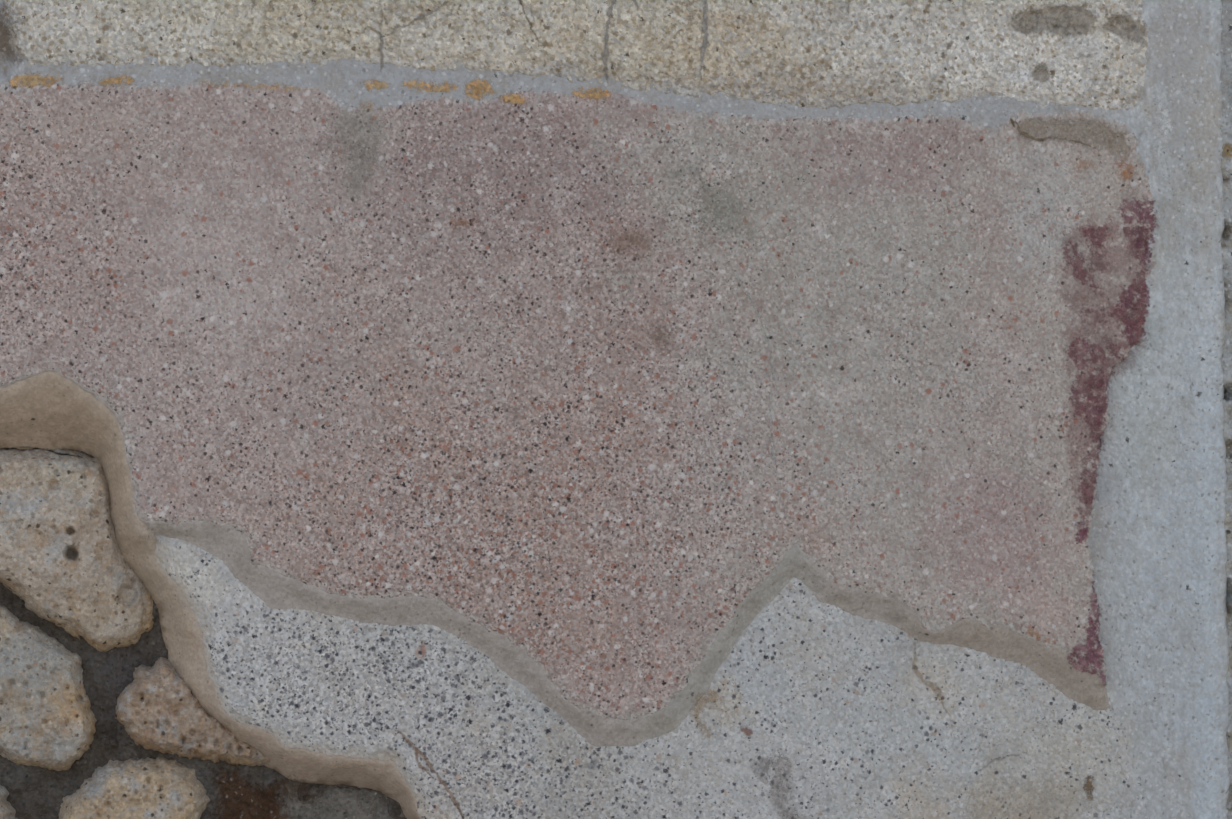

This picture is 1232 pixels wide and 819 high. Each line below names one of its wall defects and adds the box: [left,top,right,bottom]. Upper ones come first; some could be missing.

crack [373,3,445,68]
crack [601,0,638,79]
crack [700,0,708,77]
peeling [1063,199,1156,434]
peeling [0,367,1148,819]